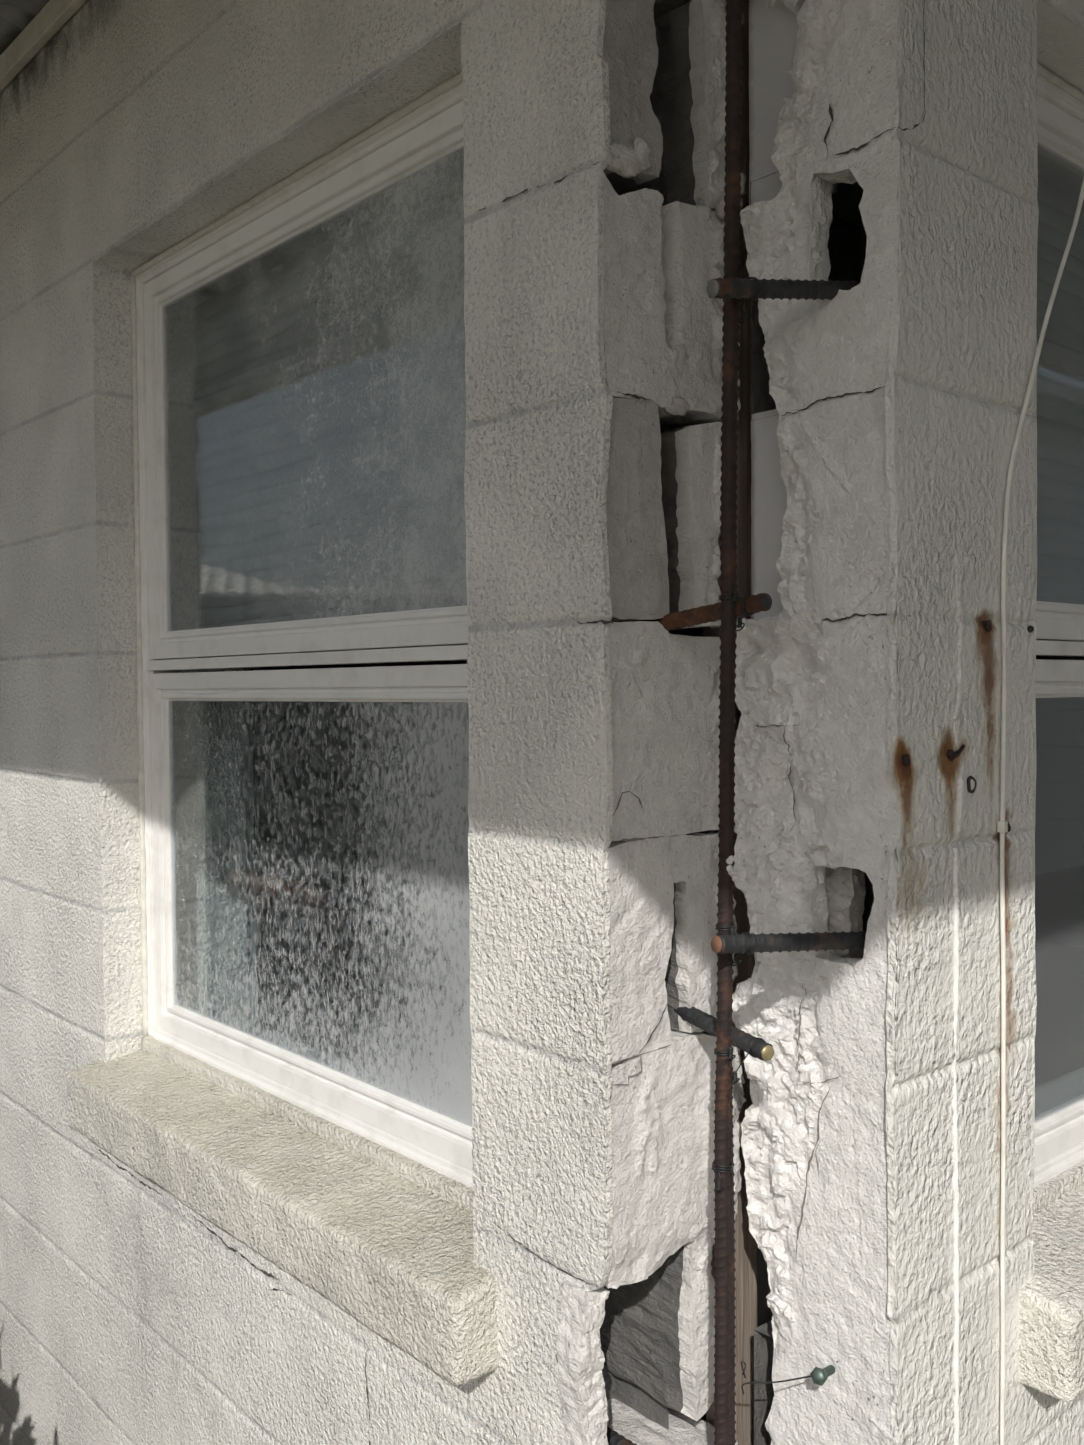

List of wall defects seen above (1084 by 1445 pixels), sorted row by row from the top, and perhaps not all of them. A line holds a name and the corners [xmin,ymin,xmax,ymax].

crack [613,791,670,843]
spalling [556,0,903,1445]
crack [754,725,796,835]
rust [895,740,913,824]
rust [940,732,963,803]
rust [976,612,995,769]
rust [997,812,1009,945]
crack [612,1003,668,1086]
crack [796,986,840,1259]